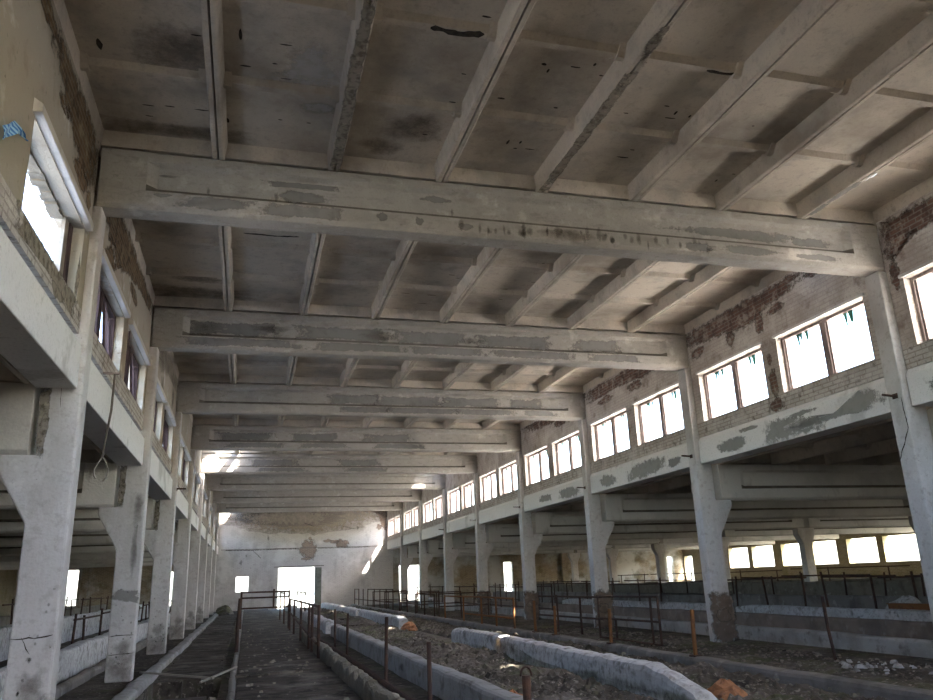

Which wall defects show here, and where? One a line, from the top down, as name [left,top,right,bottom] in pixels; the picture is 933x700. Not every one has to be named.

peeling [41,0,99,211]
spalling [330,0,375,171]
spalling [540,73,638,192]
spalling [640,26,670,61]
peeling [105,217,154,315]
peeling [880,197,933,290]
peeling [685,272,817,359]
spalling [35,388,52,456]
peeling [524,420,565,431]
peeling [584,369,653,405]
spalling [299,537,349,560]
crack [10,635,52,654]